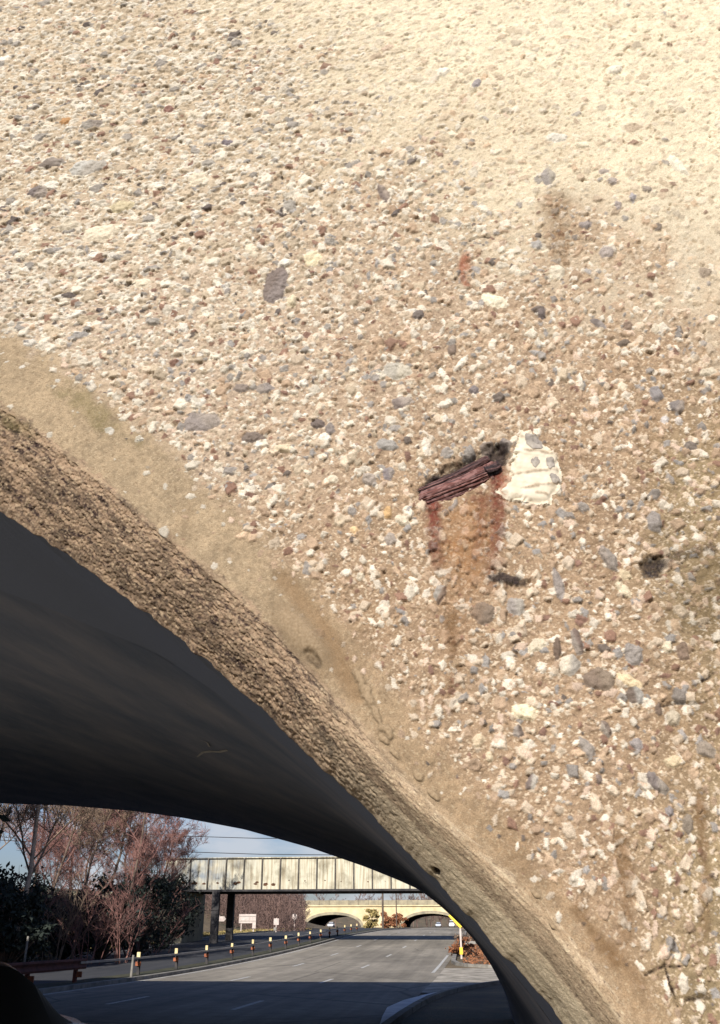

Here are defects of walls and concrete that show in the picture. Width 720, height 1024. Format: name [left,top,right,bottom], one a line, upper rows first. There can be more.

spalling [418,442,508,505]